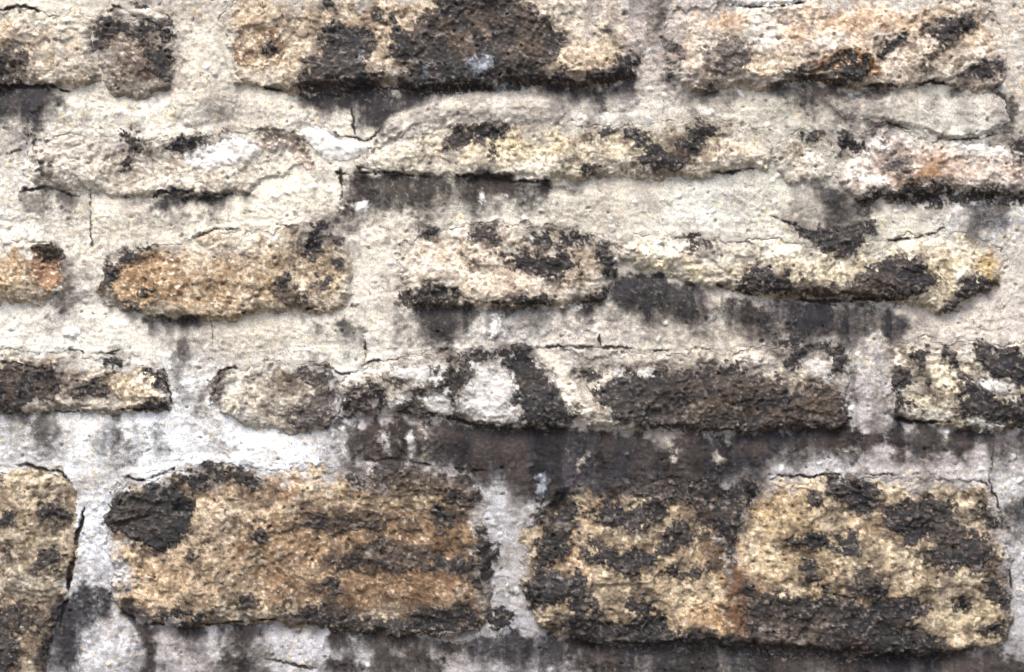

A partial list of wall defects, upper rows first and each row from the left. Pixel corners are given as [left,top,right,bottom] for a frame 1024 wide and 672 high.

water stain [301,85,437,131]
water stain [577,306,594,322]
water stain [605,271,909,344]
water stain [326,348,1024,509]
crack [66,507,85,591]